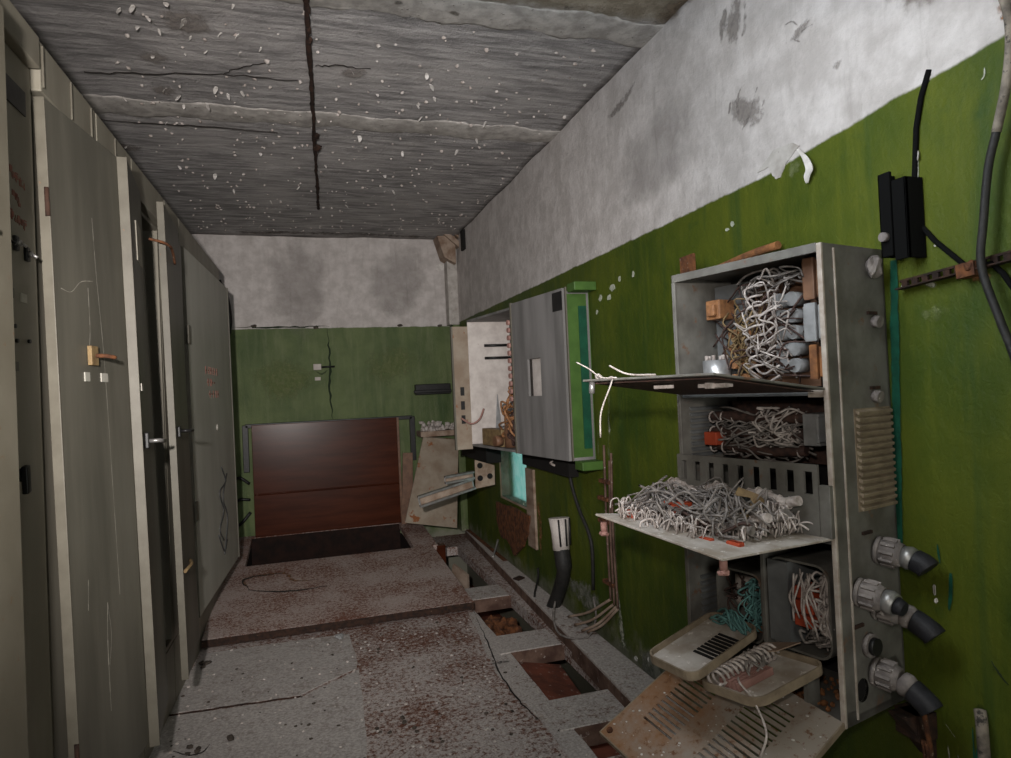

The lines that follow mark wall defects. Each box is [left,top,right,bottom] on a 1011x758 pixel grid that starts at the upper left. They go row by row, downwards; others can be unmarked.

crack [237,326,333,419]